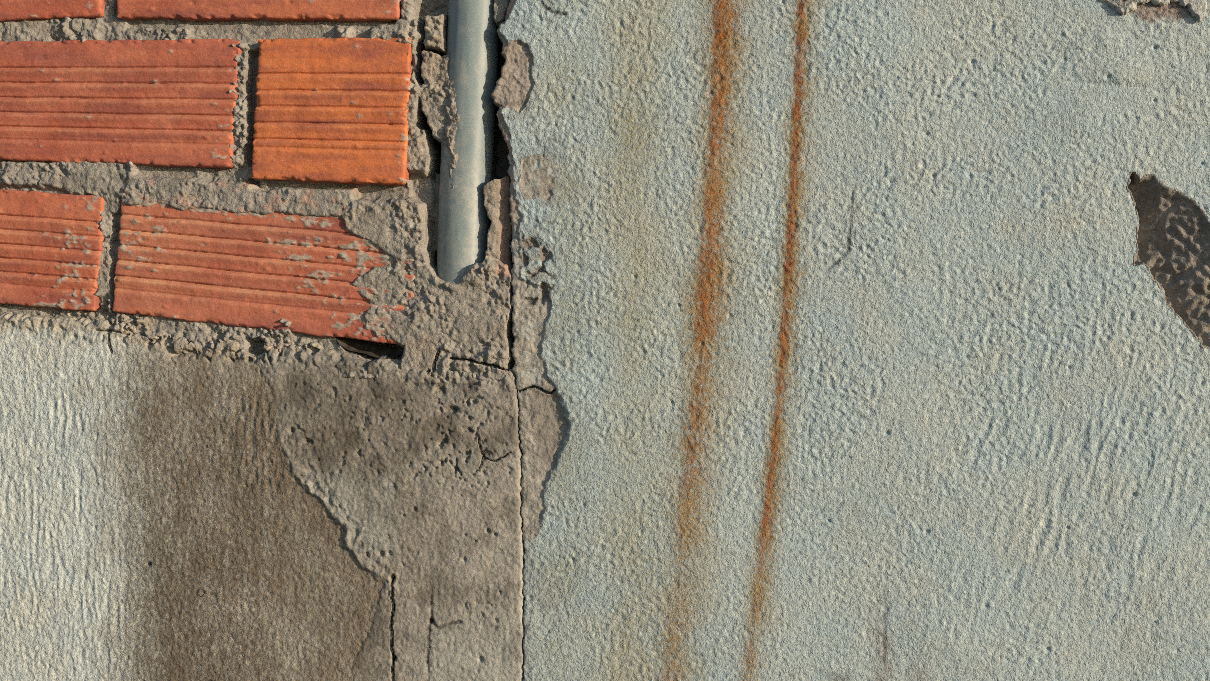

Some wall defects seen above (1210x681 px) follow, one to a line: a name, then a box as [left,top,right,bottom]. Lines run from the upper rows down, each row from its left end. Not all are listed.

peeling [1098,0,1207,23]
leakage [134,356,383,681]
crack [456,436,511,475]
crack [428,350,555,406]
spalling [491,0,569,542]
rust [679,0,740,460]
rust [750,1,812,620]
spalling [1127,172,1210,349]
crack [388,577,396,681]
crack [427,602,461,681]